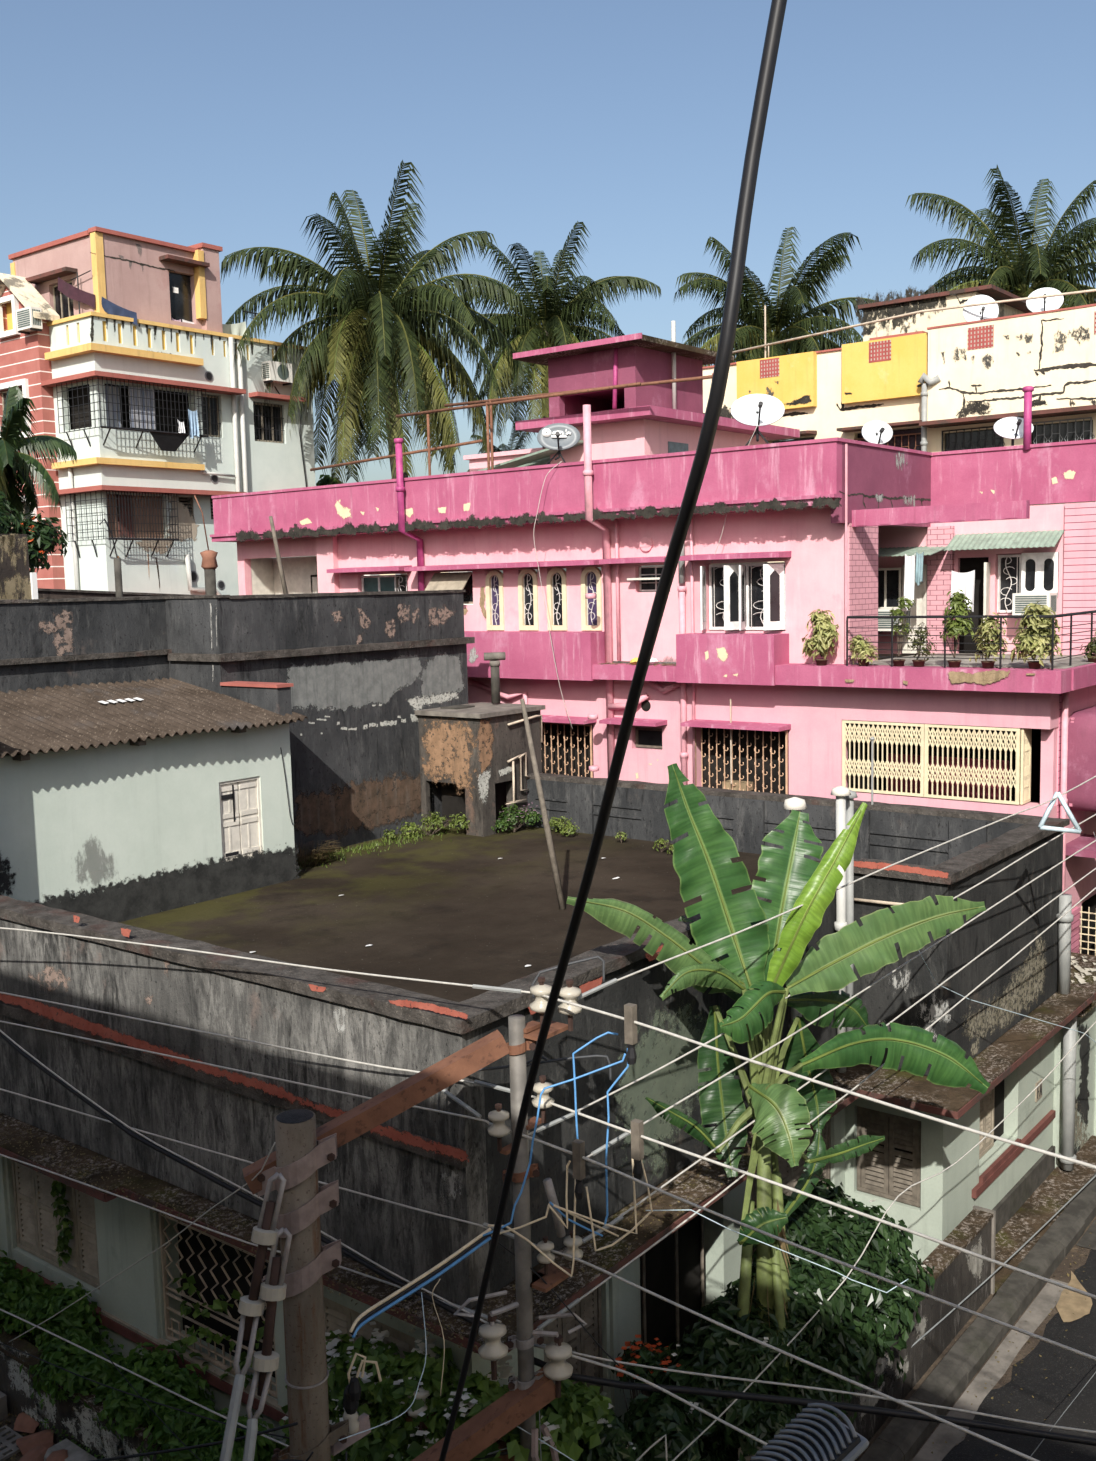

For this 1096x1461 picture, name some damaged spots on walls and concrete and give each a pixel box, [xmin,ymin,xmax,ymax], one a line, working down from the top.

crack [939,318,1096,416]
spalling [787,395,812,406]
peeling [335,500,379,520]
leakage [0,534,32,604]
peeling [39,610,73,656]
peeling [332,587,486,645]
peeling [300,691,459,736]
leakage [0,716,494,923]
peeling [0,1341,150,1461]